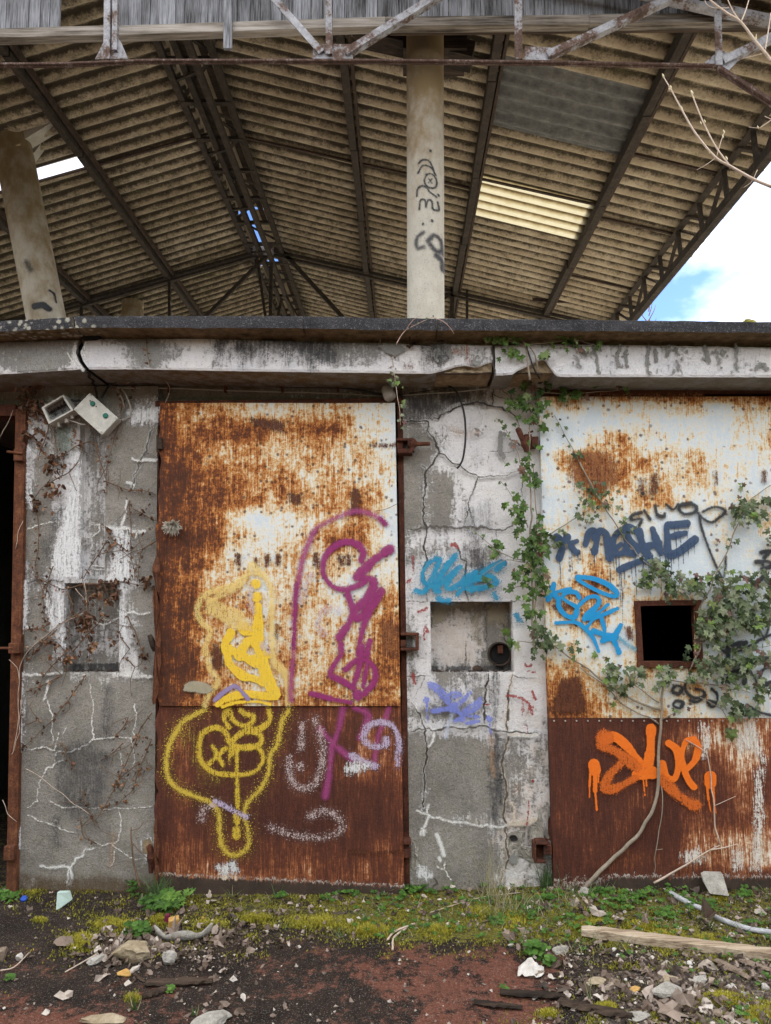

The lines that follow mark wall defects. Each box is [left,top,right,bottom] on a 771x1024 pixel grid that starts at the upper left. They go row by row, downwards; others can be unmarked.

crack [67,315,98,399]
corrosion [251,417,288,434]
corrosion [285,491,302,507]
corrosion [349,486,362,516]
crack [405,345,527,659]
corrosion [569,449,620,499]
corrosion [638,473,659,496]
corrosion [210,643,224,671]
crack [23,672,152,885]
crack [407,673,539,881]